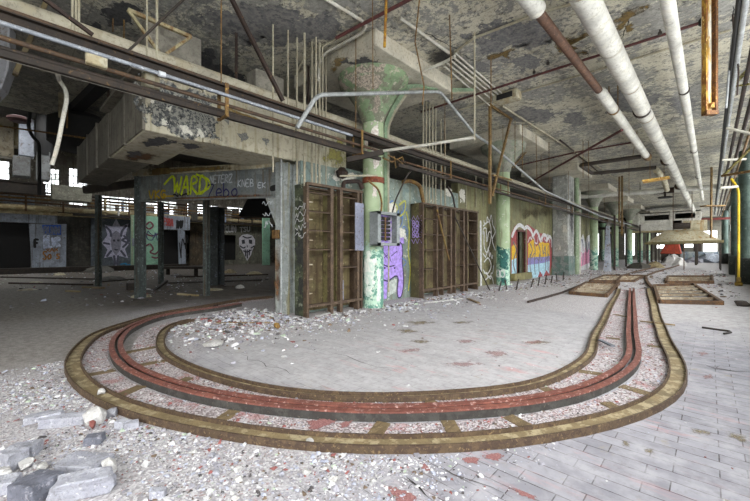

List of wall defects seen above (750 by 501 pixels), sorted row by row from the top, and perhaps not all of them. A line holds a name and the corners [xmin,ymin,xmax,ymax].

peeling [470,15,550,73]
peeling [126,79,229,158]
peeling [330,55,386,151]
peeling [497,102,588,128]
peeling [610,90,632,113]
peeling [644,90,683,120]
peeling [363,245,381,302]
peeling [497,245,509,283]